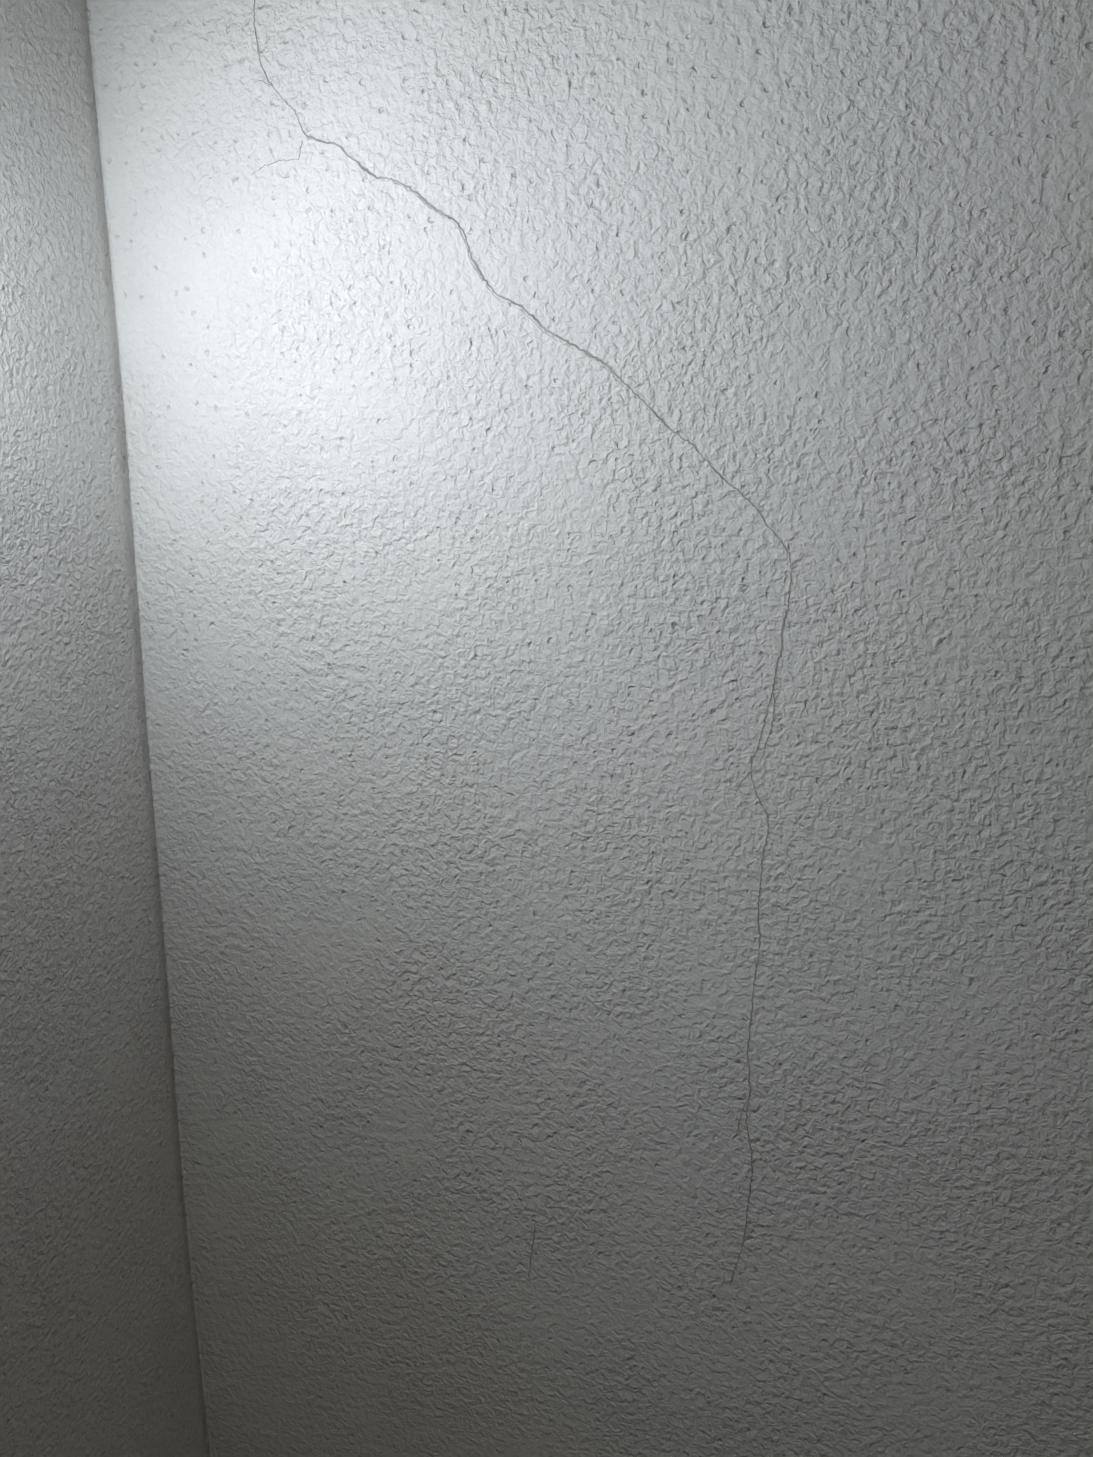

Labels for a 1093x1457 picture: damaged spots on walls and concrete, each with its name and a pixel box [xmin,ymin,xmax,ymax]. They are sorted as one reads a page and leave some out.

crack [251,0,792,1286]